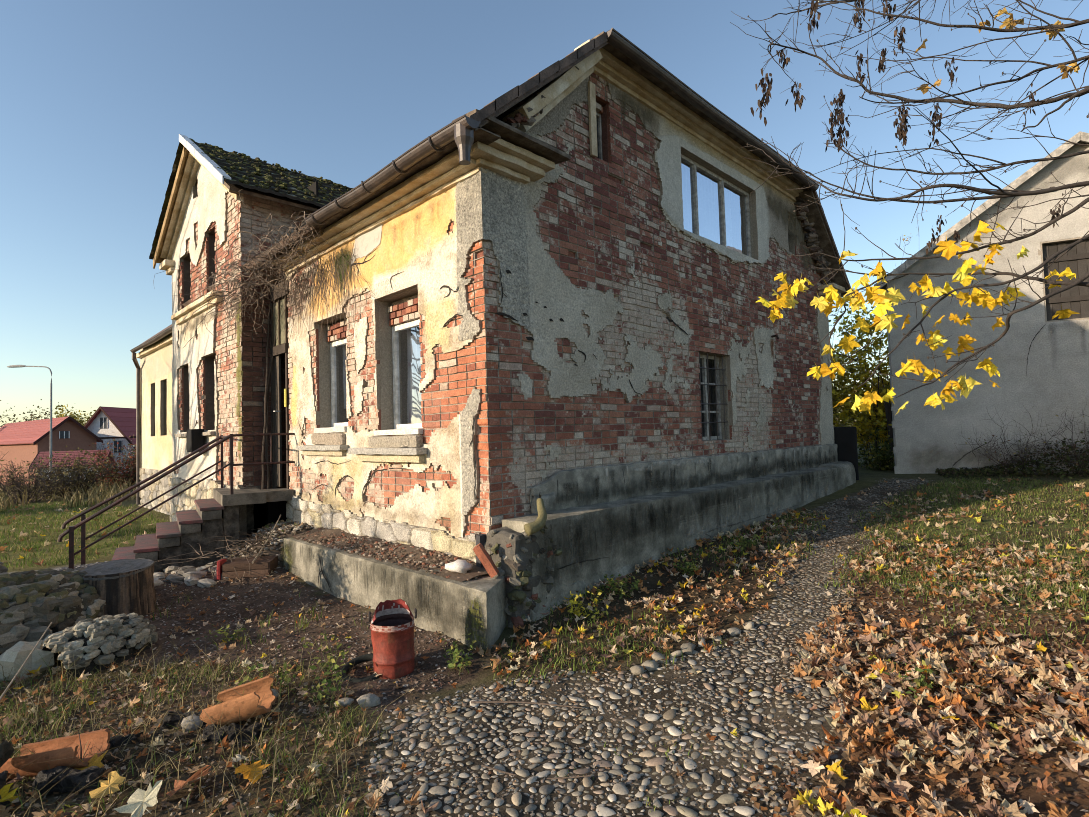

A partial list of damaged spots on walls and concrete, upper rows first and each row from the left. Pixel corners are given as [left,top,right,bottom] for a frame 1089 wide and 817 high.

flaking render [179,193,457,514]
crack [318,555,331,591]
flaking render [419,73,829,536]
damp [543,447,836,578]